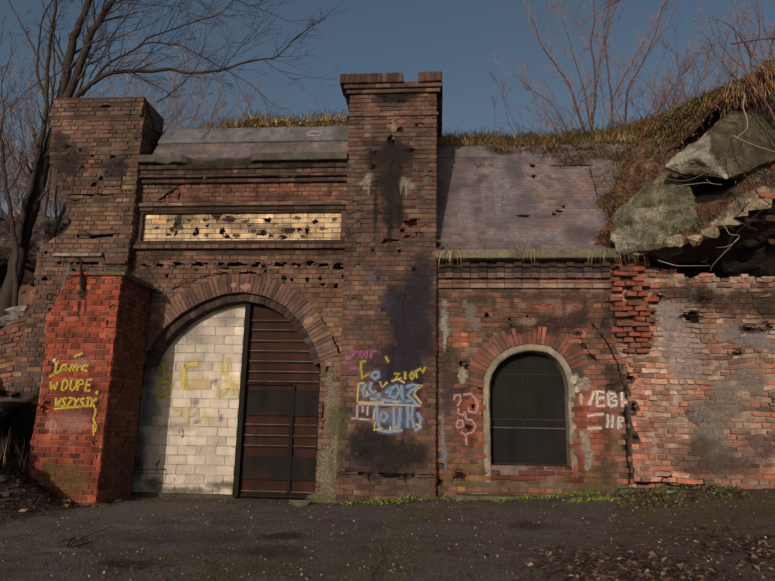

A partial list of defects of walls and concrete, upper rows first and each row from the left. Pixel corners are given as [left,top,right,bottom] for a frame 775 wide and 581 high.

spalling [155,214,287,239]
crack [573,314,641,484]